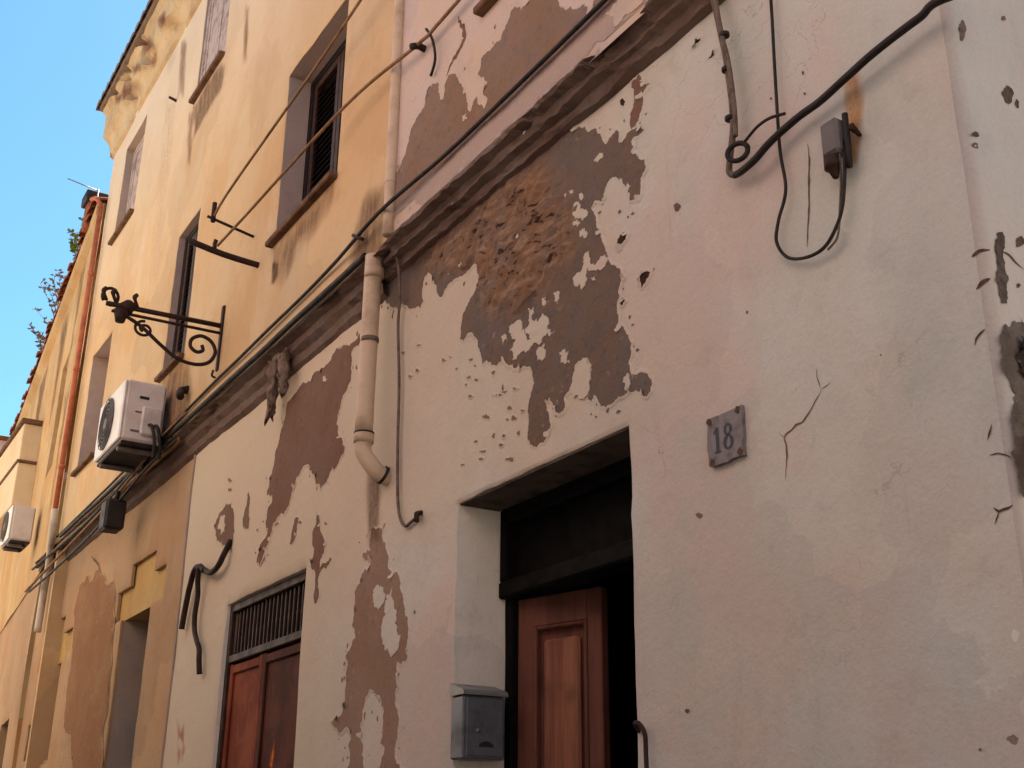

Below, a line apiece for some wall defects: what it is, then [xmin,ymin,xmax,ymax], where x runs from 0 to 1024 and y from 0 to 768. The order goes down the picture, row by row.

peeling [394,0,646,223]
corrosion [847,77,860,162]
peeling [381,72,656,468]
flaking render [972,232,1024,304]
peeling [213,331,361,606]
crack [781,369,827,477]
crack [993,505,1013,523]
flaking render [999,320,1024,497]
peeling [64,568,116,768]
peeling [330,524,416,768]